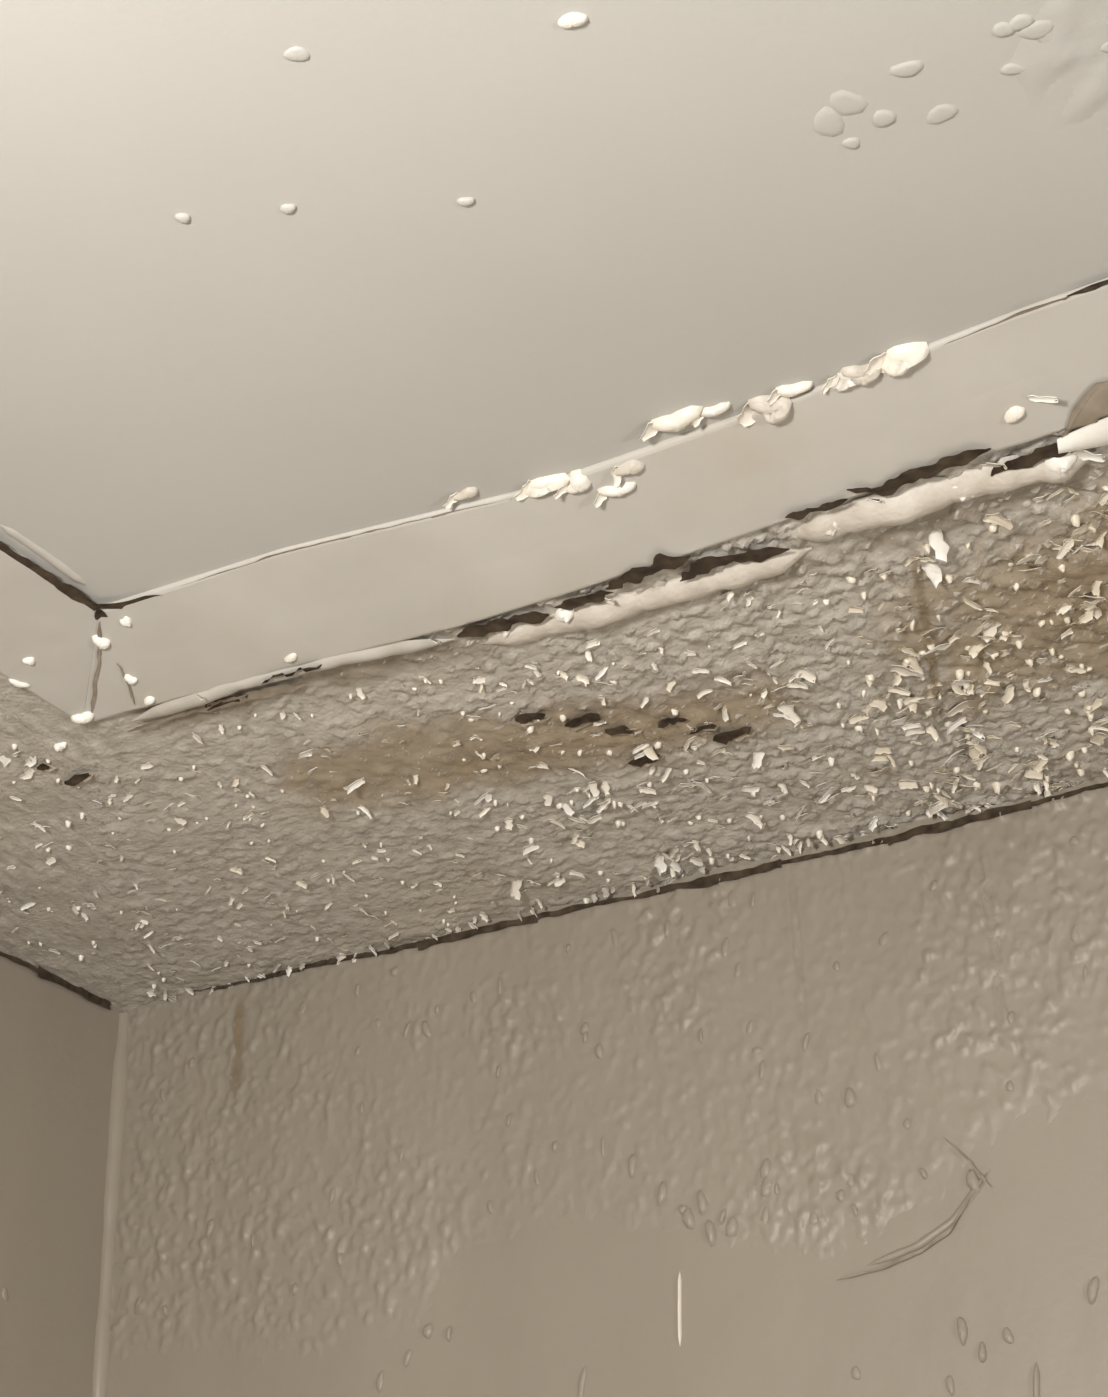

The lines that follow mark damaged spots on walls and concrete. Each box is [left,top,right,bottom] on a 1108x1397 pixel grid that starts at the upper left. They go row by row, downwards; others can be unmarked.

peeling [639,342,930,442]
crack [457,443,1069,638]
peeling [8,679,30,688]
peeling [0,742,95,801]
peeling [70,710,94,724]
peeling [92,635,111,650]
peeling [32,763,284,870]
leakage [290,693,779,799]
peeling [120,381,1108,1003]
leakage [907,534,1108,685]
peeling [0,887,61,954]
peeling [71,891,99,921]